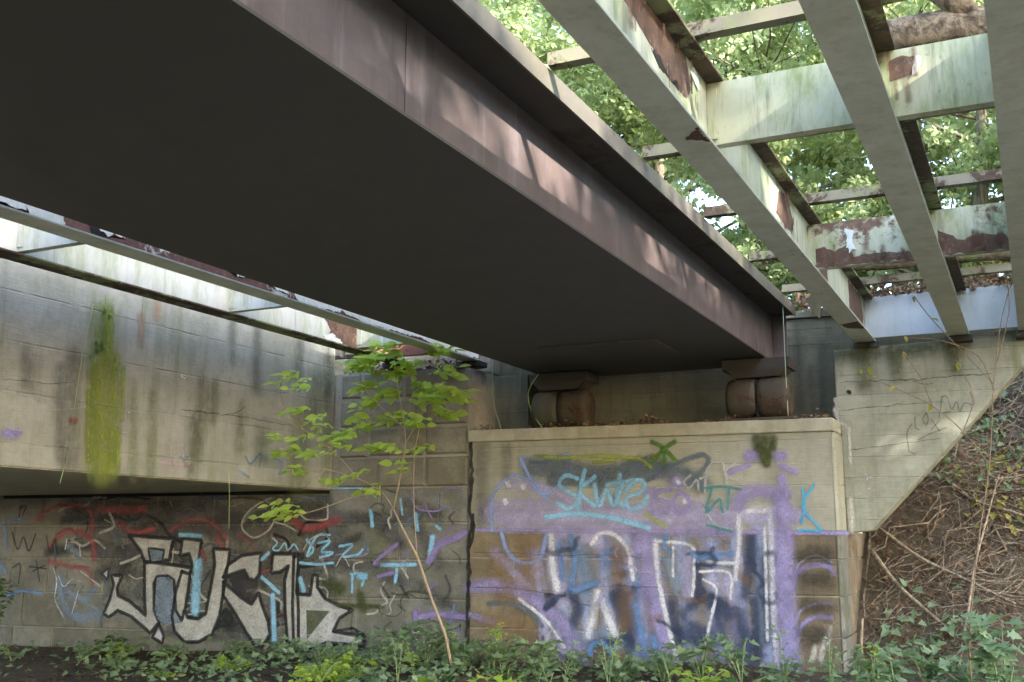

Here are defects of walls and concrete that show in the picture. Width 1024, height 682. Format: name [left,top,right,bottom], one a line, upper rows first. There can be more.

rust [878,47,921,102]
rust [815,228,914,269]
rust [938,229,1009,255]
water stain [86,303,125,481]
water stain [753,435,777,467]
crack [465,442,644,653]